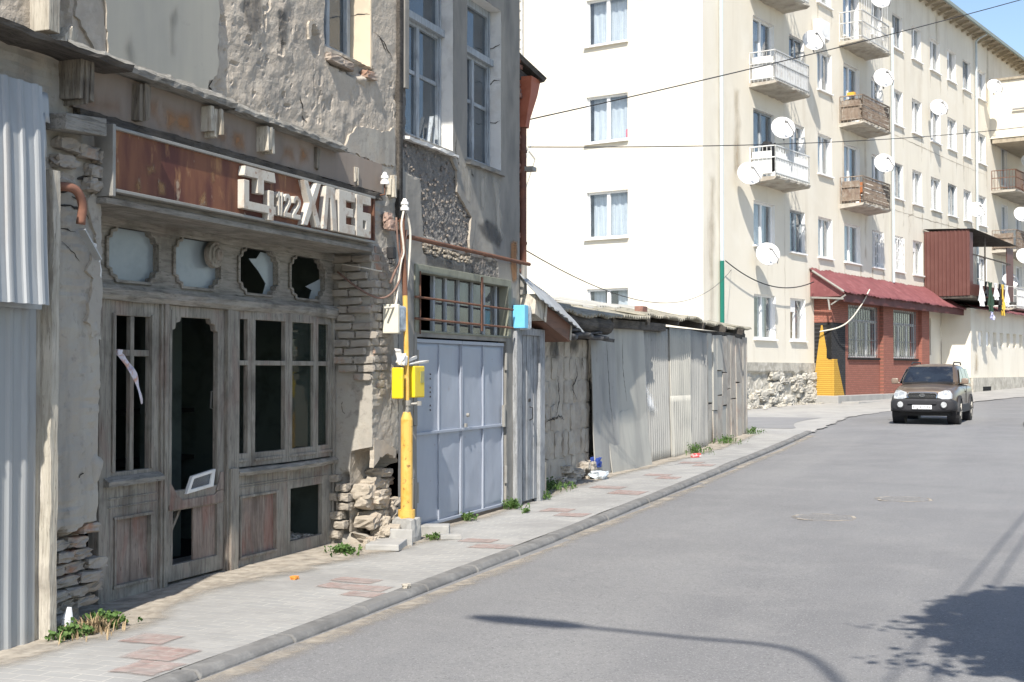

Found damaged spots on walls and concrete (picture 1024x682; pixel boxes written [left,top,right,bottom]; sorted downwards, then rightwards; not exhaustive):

spalling [306,20,317,40]
peeling [344,126,476,263]
spalling [320,246,396,396]
spalling [329,438,401,544]
spalling [56,521,108,629]